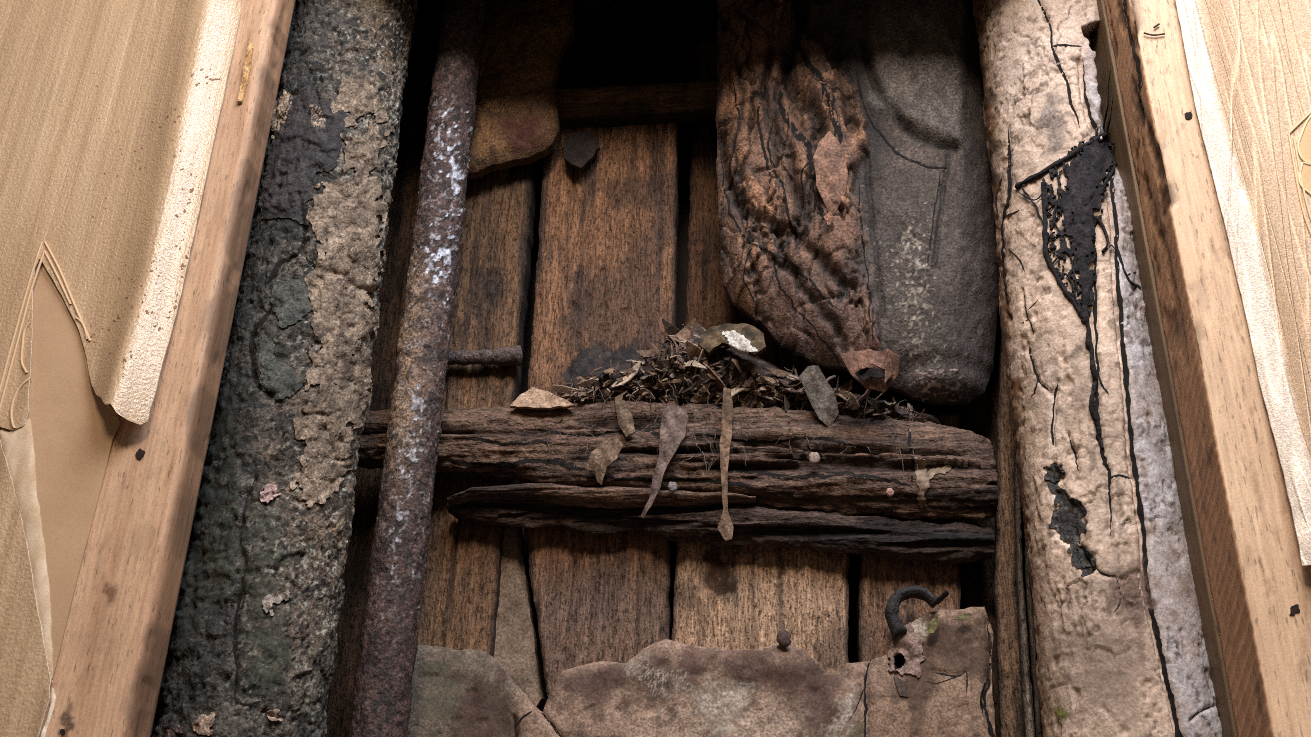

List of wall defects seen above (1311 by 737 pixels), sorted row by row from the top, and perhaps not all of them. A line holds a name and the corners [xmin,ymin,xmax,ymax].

crack [1037,0,1098,133]
crack [1122,0,1144,116]
crack [995,129,1213,737]
peeling [262,590,292,616]
peeling [165,712,216,737]
peeling [267,709,283,722]
crack [514,711,562,737]